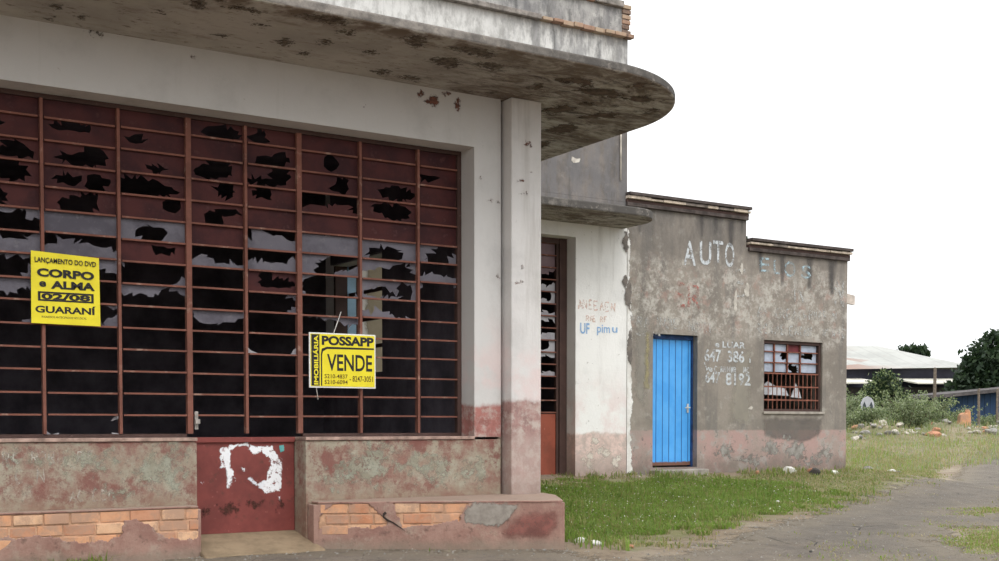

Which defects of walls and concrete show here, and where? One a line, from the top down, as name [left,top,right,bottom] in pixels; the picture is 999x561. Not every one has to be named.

water stain [714,419,833,467]
flaking render [321,442,448,534]
flaking render [395,502,517,528]